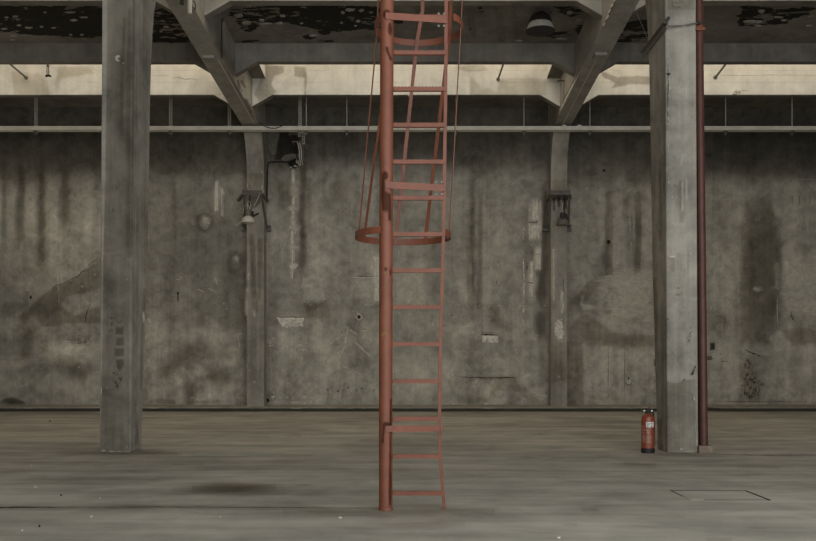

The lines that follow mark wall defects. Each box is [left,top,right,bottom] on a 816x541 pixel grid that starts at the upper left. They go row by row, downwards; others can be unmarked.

peeling [0,6,102,41]
peeling [229,6,380,42]
peeling [736,6,816,27]